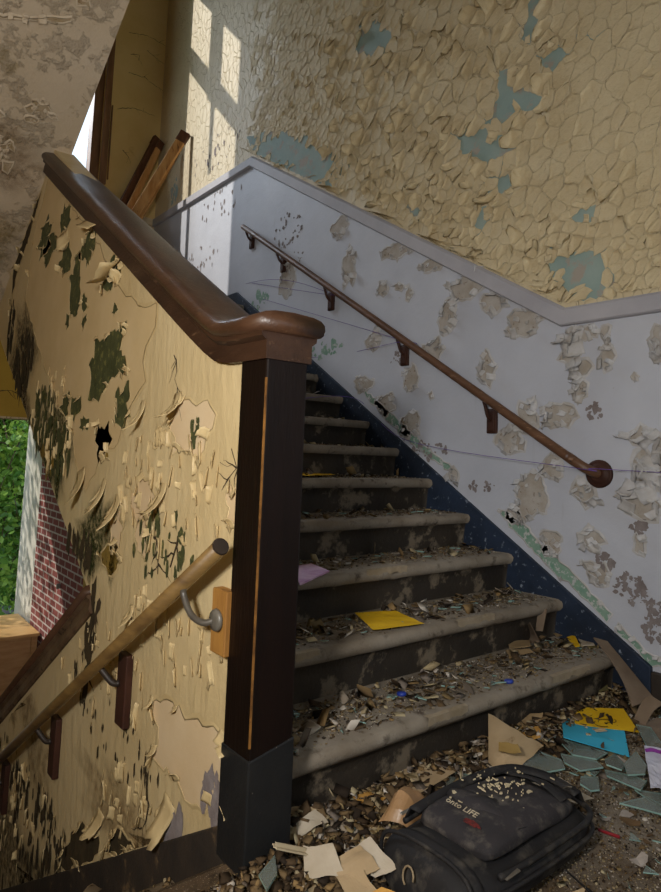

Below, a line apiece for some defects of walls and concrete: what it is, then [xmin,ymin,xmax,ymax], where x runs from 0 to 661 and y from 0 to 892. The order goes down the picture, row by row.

peeling [196,0,661,493]
peeling [0,762,55,871]
peeling [25,178,236,685]
peeling [54,608,225,874]
spalling [456,612,495,627]
peeling [496,422,661,667]